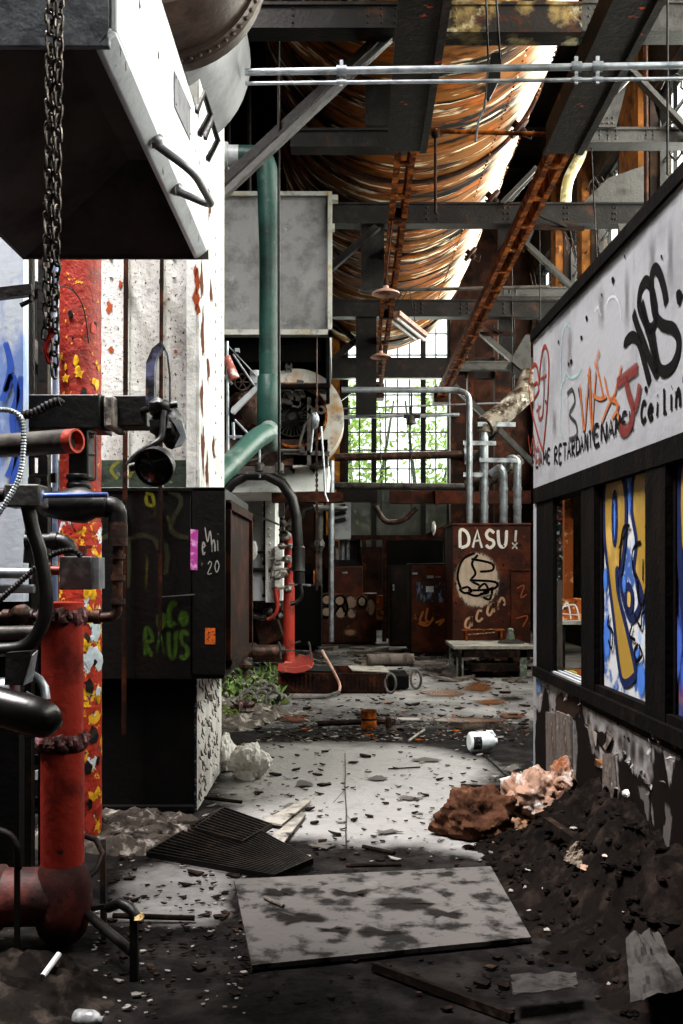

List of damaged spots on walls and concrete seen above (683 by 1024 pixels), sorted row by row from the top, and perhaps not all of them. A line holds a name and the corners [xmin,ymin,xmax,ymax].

corrosion [192,265,201,315]
peeling [532,682,683,846]